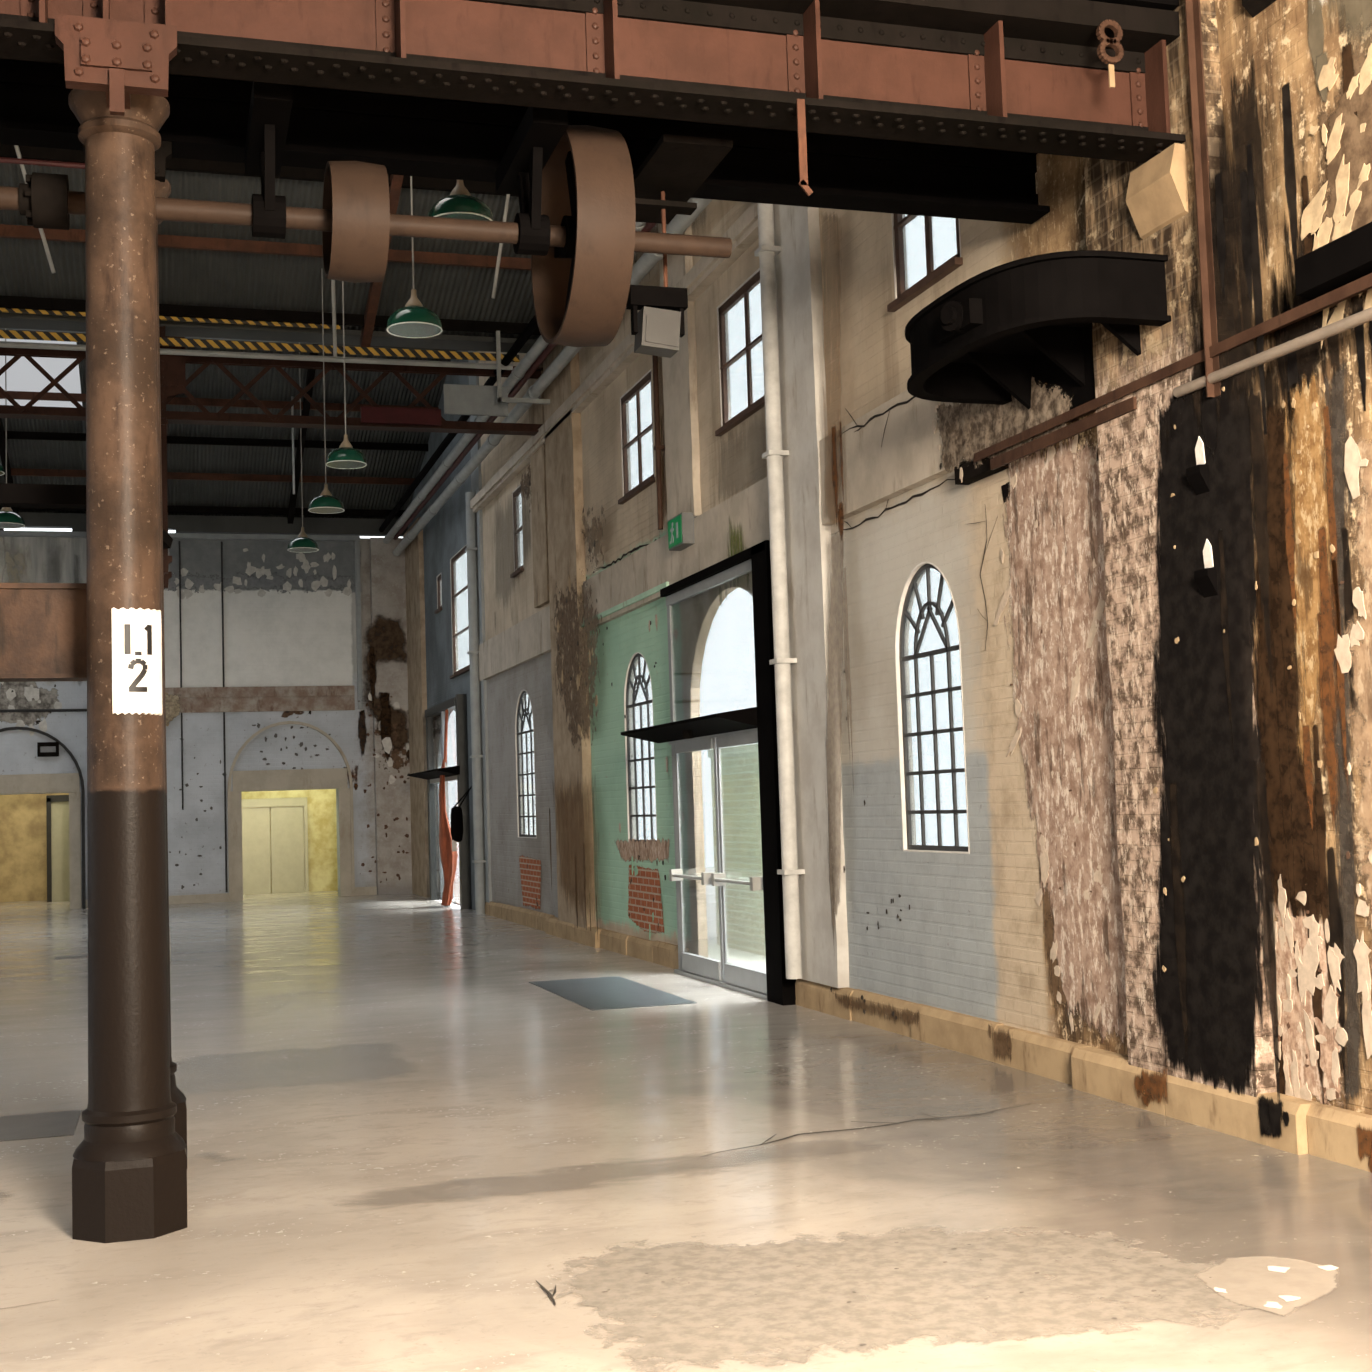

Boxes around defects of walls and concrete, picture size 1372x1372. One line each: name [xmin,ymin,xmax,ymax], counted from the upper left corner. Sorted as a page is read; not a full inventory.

peeling [1301,43,1372,255]
peeling [1310,288,1372,349]
peeling [168,548,355,599]
peeling [358,693,410,794]
peeling [1274,436,1372,1104]